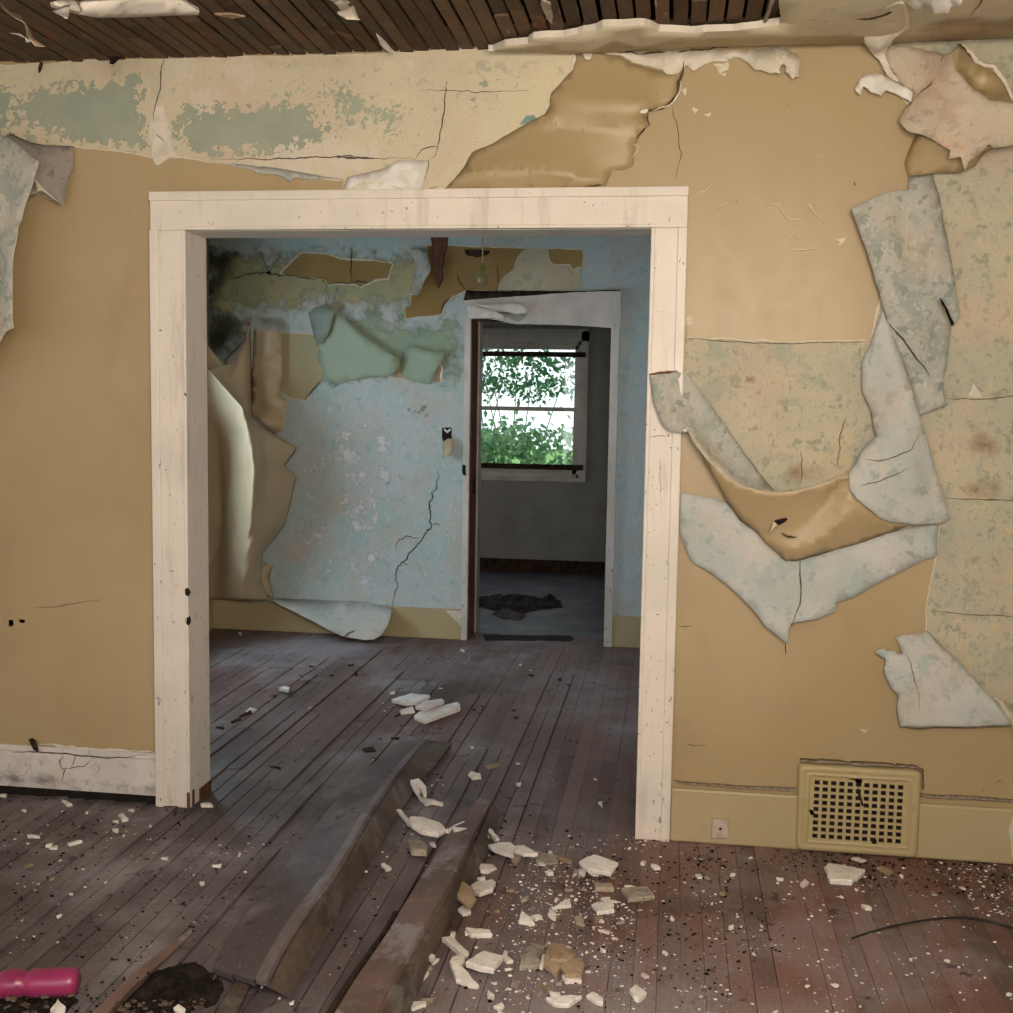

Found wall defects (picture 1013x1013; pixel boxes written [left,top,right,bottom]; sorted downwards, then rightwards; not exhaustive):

crack [220,153,387,161]
crack [411,83,528,178]
peeling [0,0,1013,189]
leakage [209,250,240,355]
peeling [211,252,462,377]
peeling [498,249,582,291]
peeling [683,297,887,491]
peeling [886,144,1013,726]
crack [392,471,440,604]